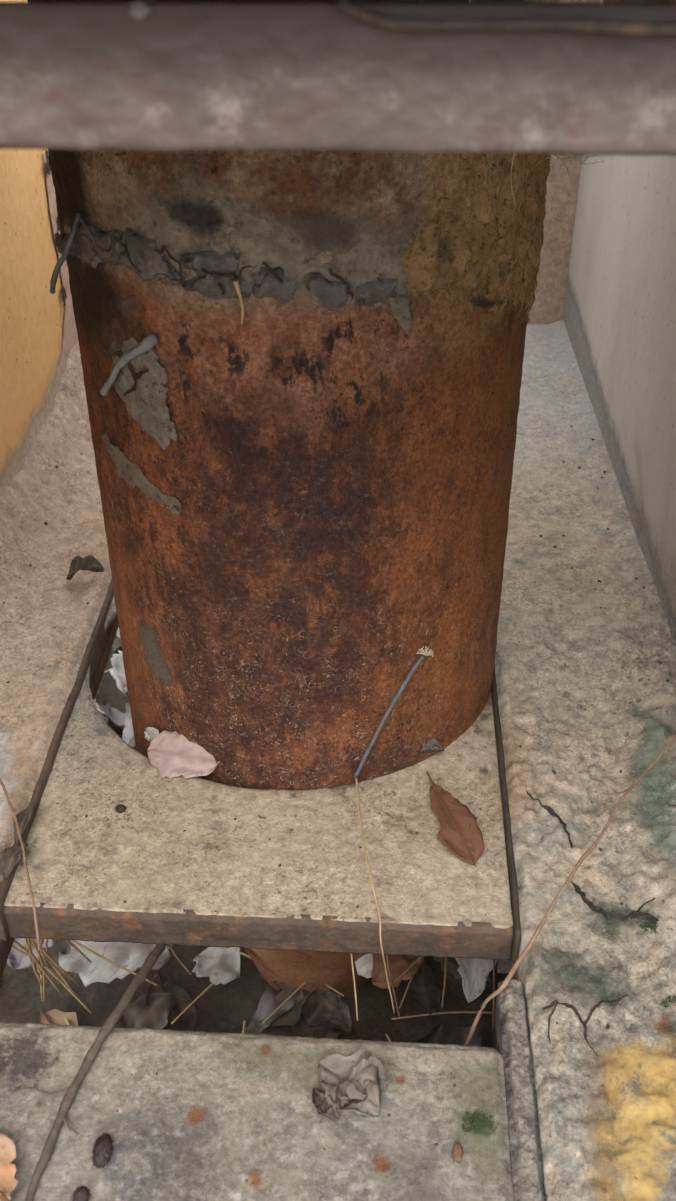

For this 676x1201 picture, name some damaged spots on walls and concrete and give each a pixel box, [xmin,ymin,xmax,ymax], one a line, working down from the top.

peeling [42,149,78,408]
water stain [563,277,676,643]
crack [542,994,630,1057]